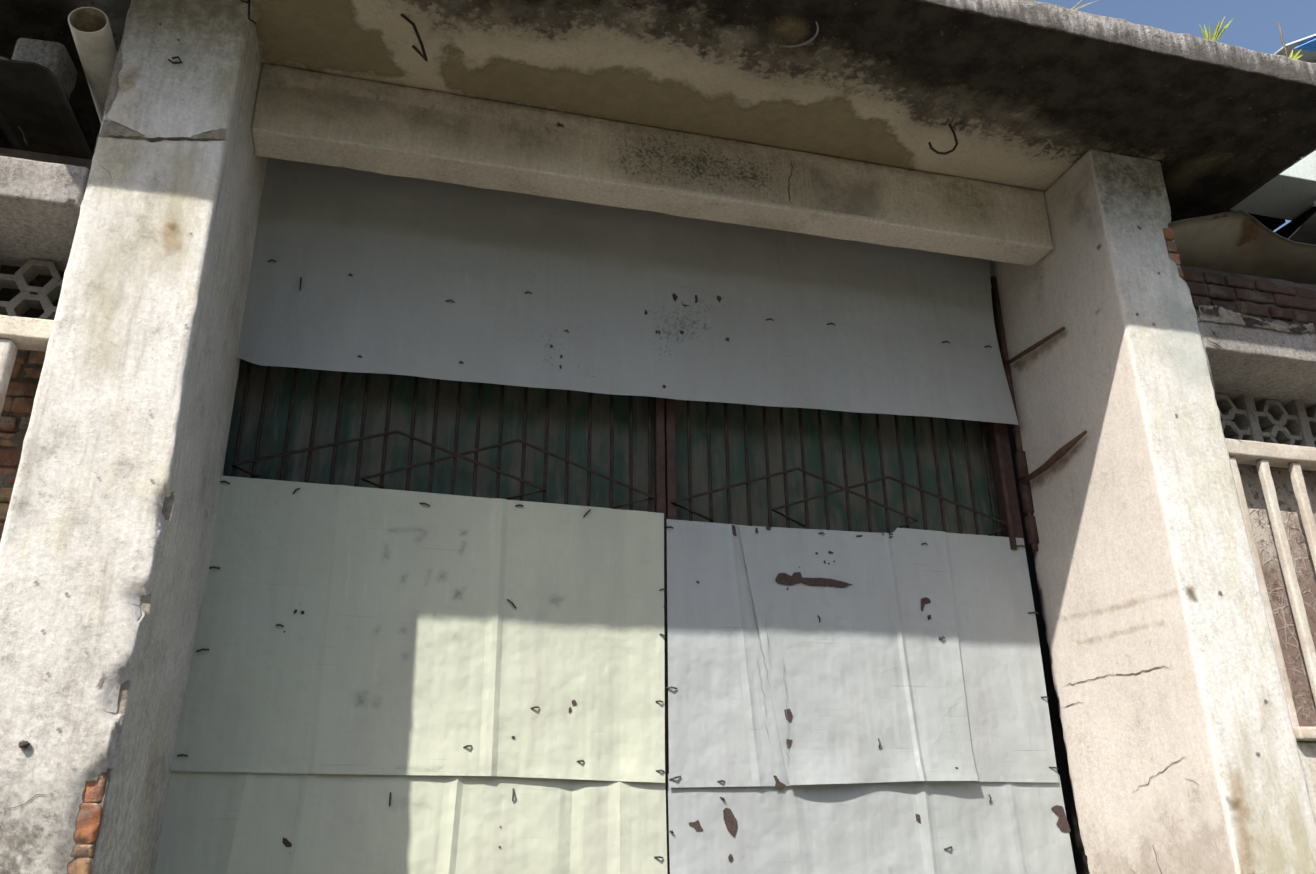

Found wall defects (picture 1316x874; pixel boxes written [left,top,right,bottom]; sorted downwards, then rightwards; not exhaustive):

water stain [253,0,404,76]
water stain [0,0,131,153]
water stain [403,0,1316,222]
crack [100,118,227,177]
corrosion [1005,327,1065,365]
spalling [1198,305,1314,334]
corrosion [1019,430,1087,485]
crack [1064,666,1168,708]
crack [1132,757,1199,793]